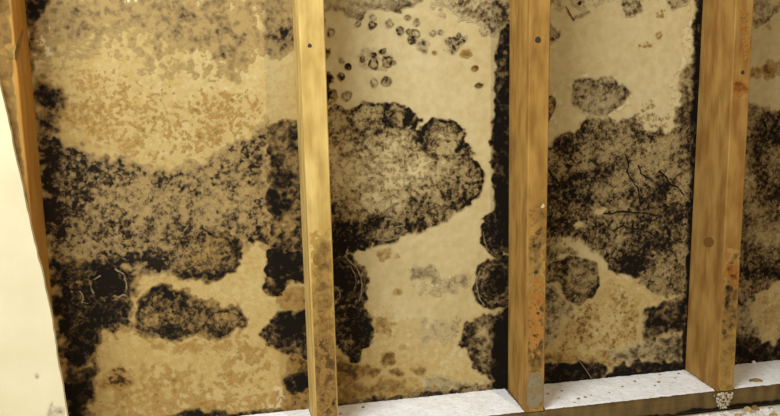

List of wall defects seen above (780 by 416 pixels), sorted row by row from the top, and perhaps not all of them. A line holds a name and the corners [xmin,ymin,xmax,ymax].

leakage [25,0,510,416]
leakage [528,0,703,384]
leakage [723,106,780,365]
mould [750,59,780,81]